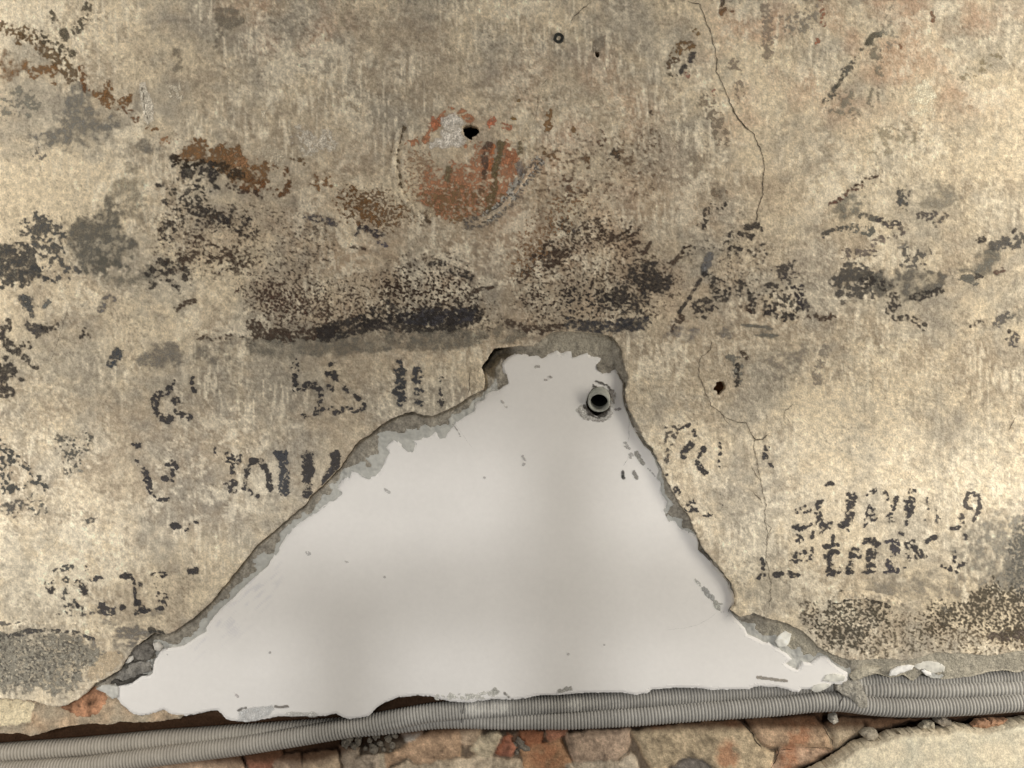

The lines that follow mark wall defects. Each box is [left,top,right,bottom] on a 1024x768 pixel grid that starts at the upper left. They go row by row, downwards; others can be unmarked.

water stain [1,85,40,118]
water stain [32,84,119,160]
rust [0,1,427,236]
rust [543,109,553,132]
water stain [699,89,730,147]
crack [688,1,765,222]
water stain [760,1,826,59]
water stain [0,161,1024,399]
rust [507,126,666,282]
flaking render [0,331,1024,736]
crack [698,342,791,607]
water stain [799,512,1024,658]